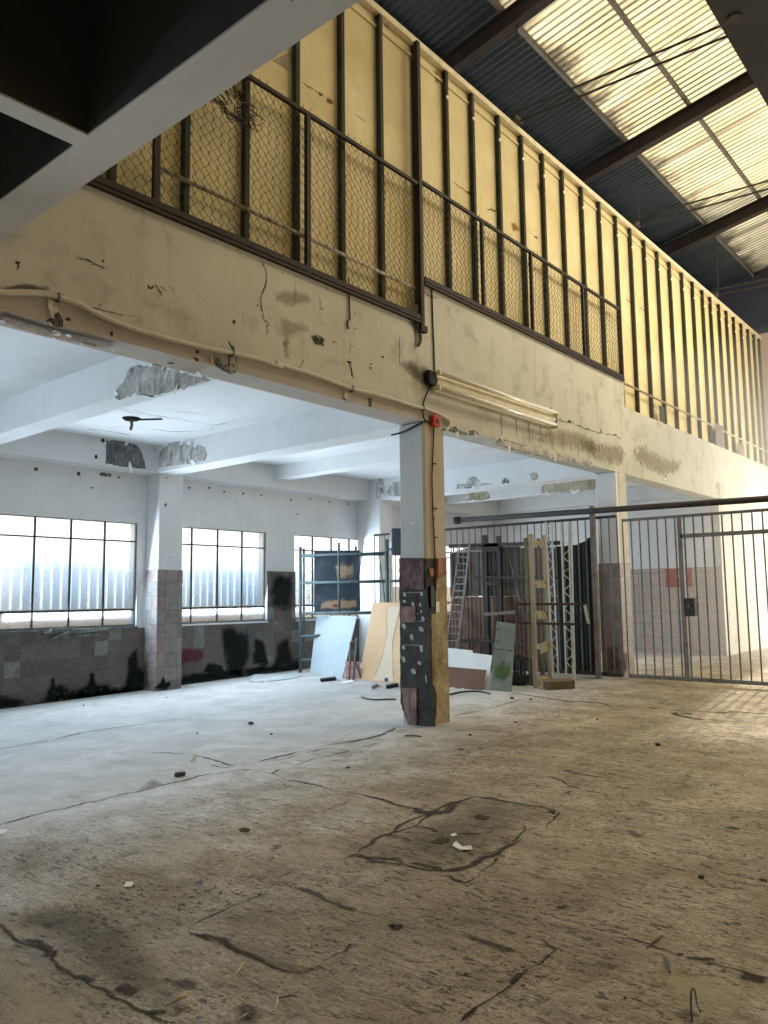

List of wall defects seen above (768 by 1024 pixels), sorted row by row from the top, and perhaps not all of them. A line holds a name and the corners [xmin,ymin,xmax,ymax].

crack [243,260,270,333]
spalling [114,341,238,400]
spalling [95,438,145,478]
spalling [158,440,207,479]
crack [0,727,614,884]
crack [190,873,361,972]
crack [0,924,176,1024]